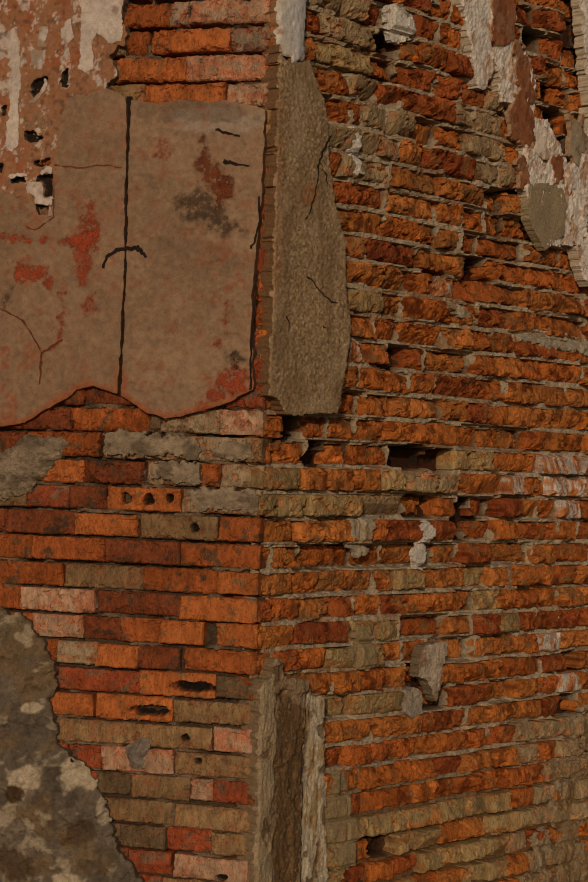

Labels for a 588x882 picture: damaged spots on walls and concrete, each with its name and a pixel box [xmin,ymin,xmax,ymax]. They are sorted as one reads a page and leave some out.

peeling [61,0,124,73]
peeling [4,26,49,152]
peeling [0,161,54,217]
crack [26,189,55,230]
crack [54,96,147,396]
crack [298,136,332,231]
crack [306,276,343,307]
flaking render [452,0,588,287]